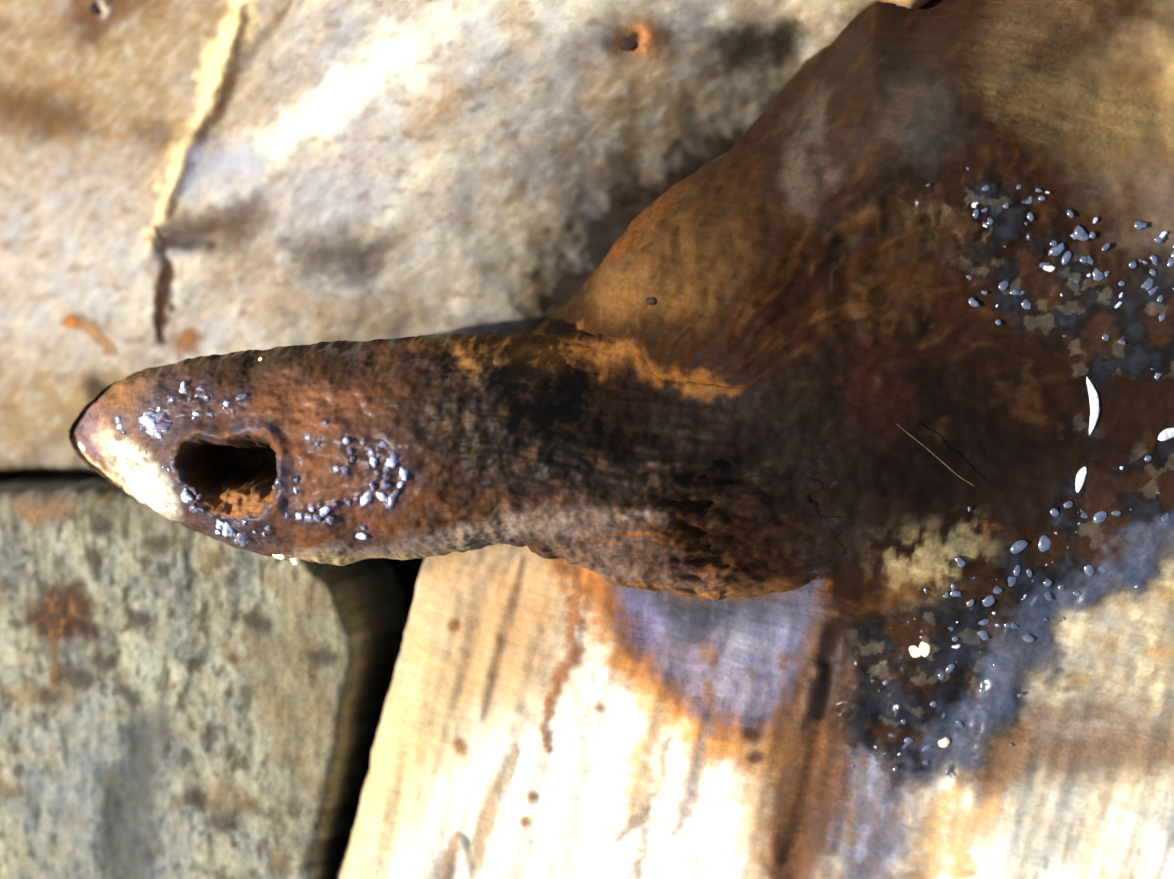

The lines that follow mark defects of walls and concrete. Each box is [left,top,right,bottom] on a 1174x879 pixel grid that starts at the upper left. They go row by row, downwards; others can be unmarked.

rust [174,329,199,356]
crack [152,7,254,344]
leakage [533,0,1174,879]